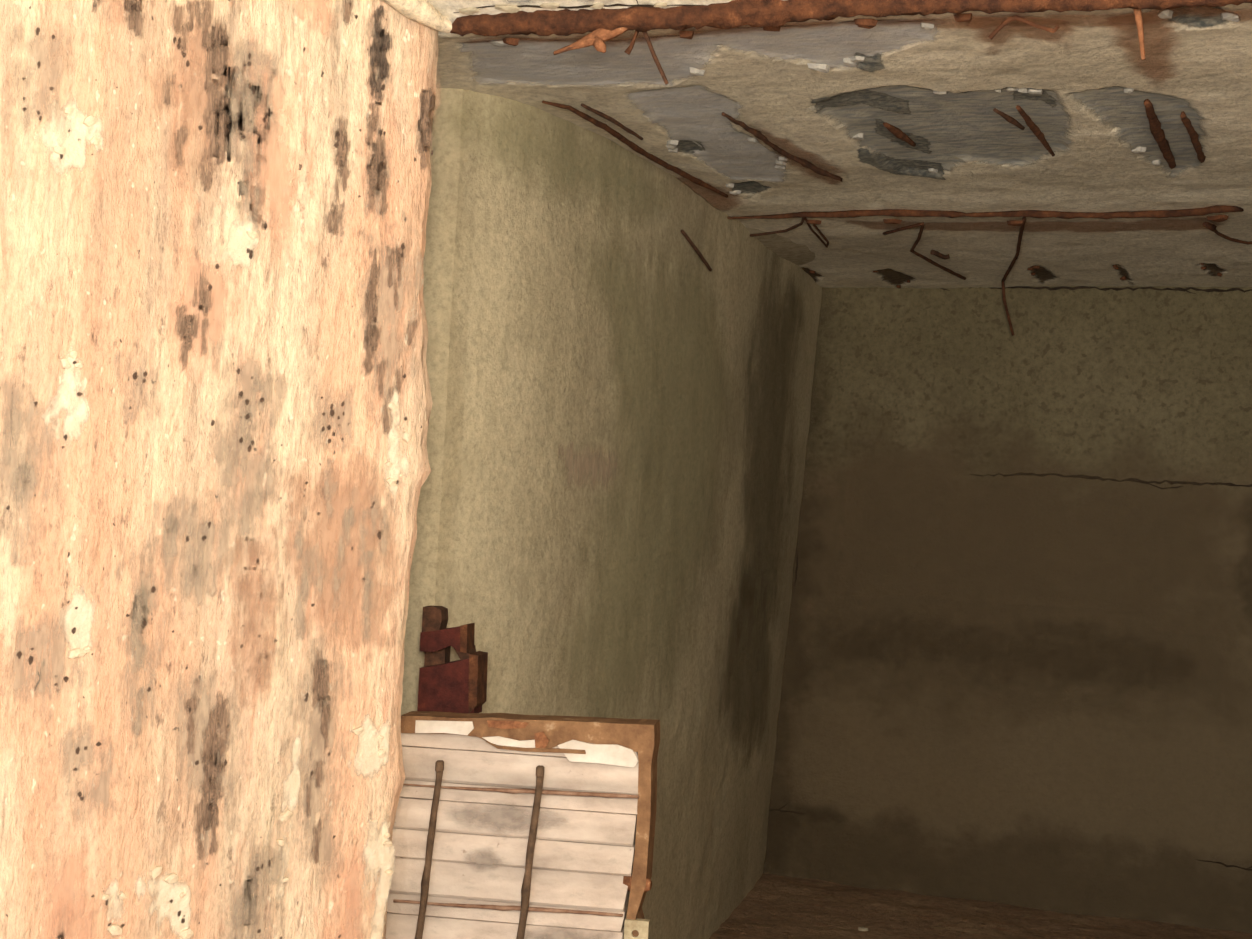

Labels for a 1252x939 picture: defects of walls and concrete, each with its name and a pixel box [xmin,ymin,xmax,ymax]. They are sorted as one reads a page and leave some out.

water stain [164,1,291,229]
water stain [327,118,351,234]
water stain [344,0,392,214]
spalling [450,0,1252,195]
spalling [727,205,1244,226]
water stain [176,263,224,369]
water stain [363,243,421,433]
water stain [125,361,285,732]
crack [970,472,1252,489]
water stain [178,678,235,859]
water stain [298,561,339,871]
crack [1196,859,1252,871]